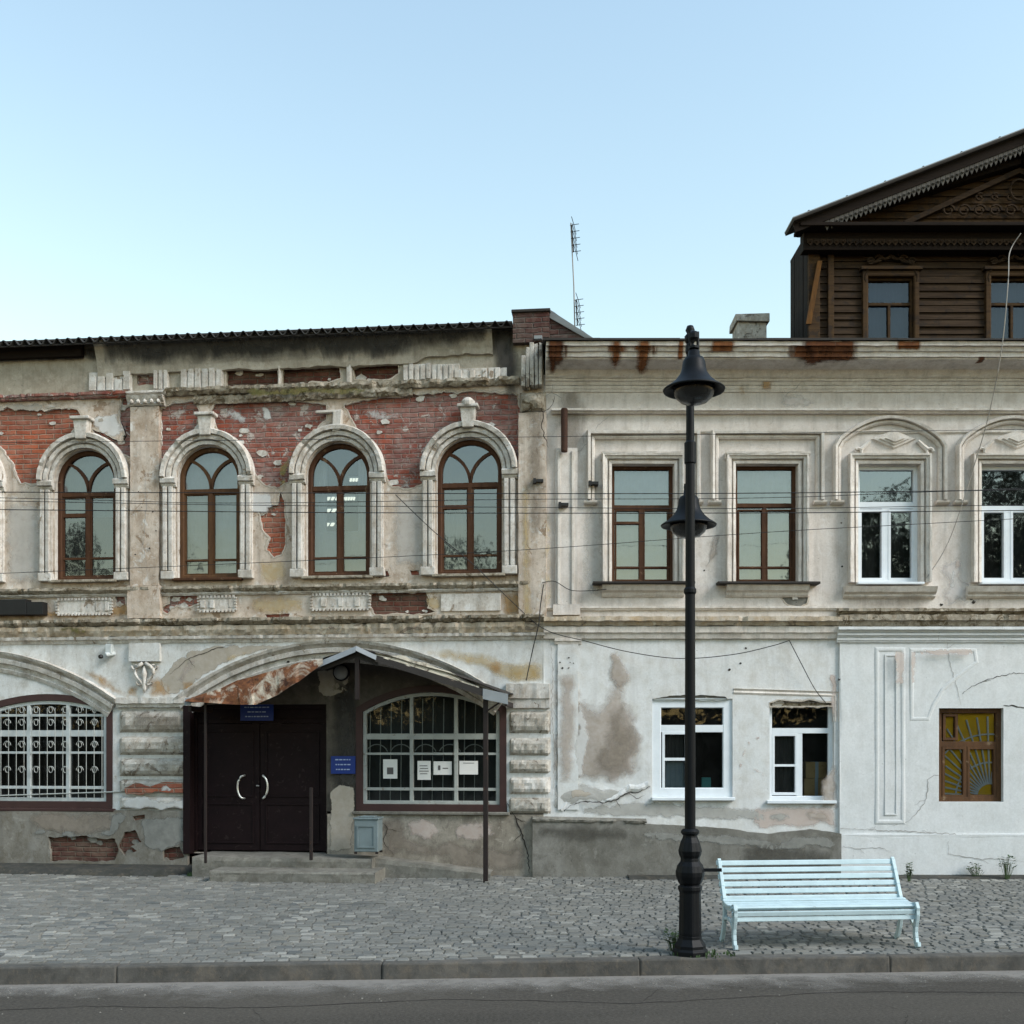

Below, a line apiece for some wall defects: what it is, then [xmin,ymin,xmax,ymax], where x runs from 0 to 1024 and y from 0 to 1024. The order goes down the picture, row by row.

corrosion [548,341,567,373]
corrosion [609,341,656,372]
corrosion [789,341,855,365]
flaking render [0,405,81,486]
flaking render [91,398,130,458]
flaking render [160,365,400,559]
flaking render [343,390,523,490]
flaking render [162,596,199,615]
crack [938,632,1024,703]
water stain [555,654,640,781]
flaking render [31,782,184,862]
crack [840,775,1022,863]